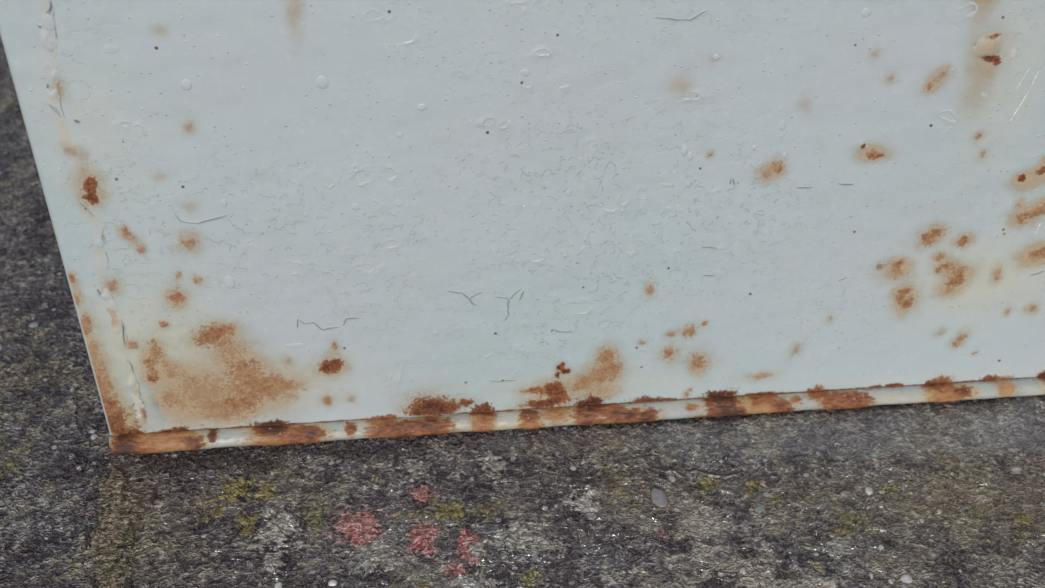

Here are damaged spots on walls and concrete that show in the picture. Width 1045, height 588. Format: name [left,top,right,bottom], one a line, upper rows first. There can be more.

rust [860,144,886,161]
rust [81,171,101,205]
rust [762,163,785,179]
rust [1011,158,1045,226]
rust [920,226,970,295]
rust [1019,243,1045,266]
rust [68,274,83,304]
rust [166,291,186,308]
rust [877,258,916,313]
rust [81,316,1045,455]